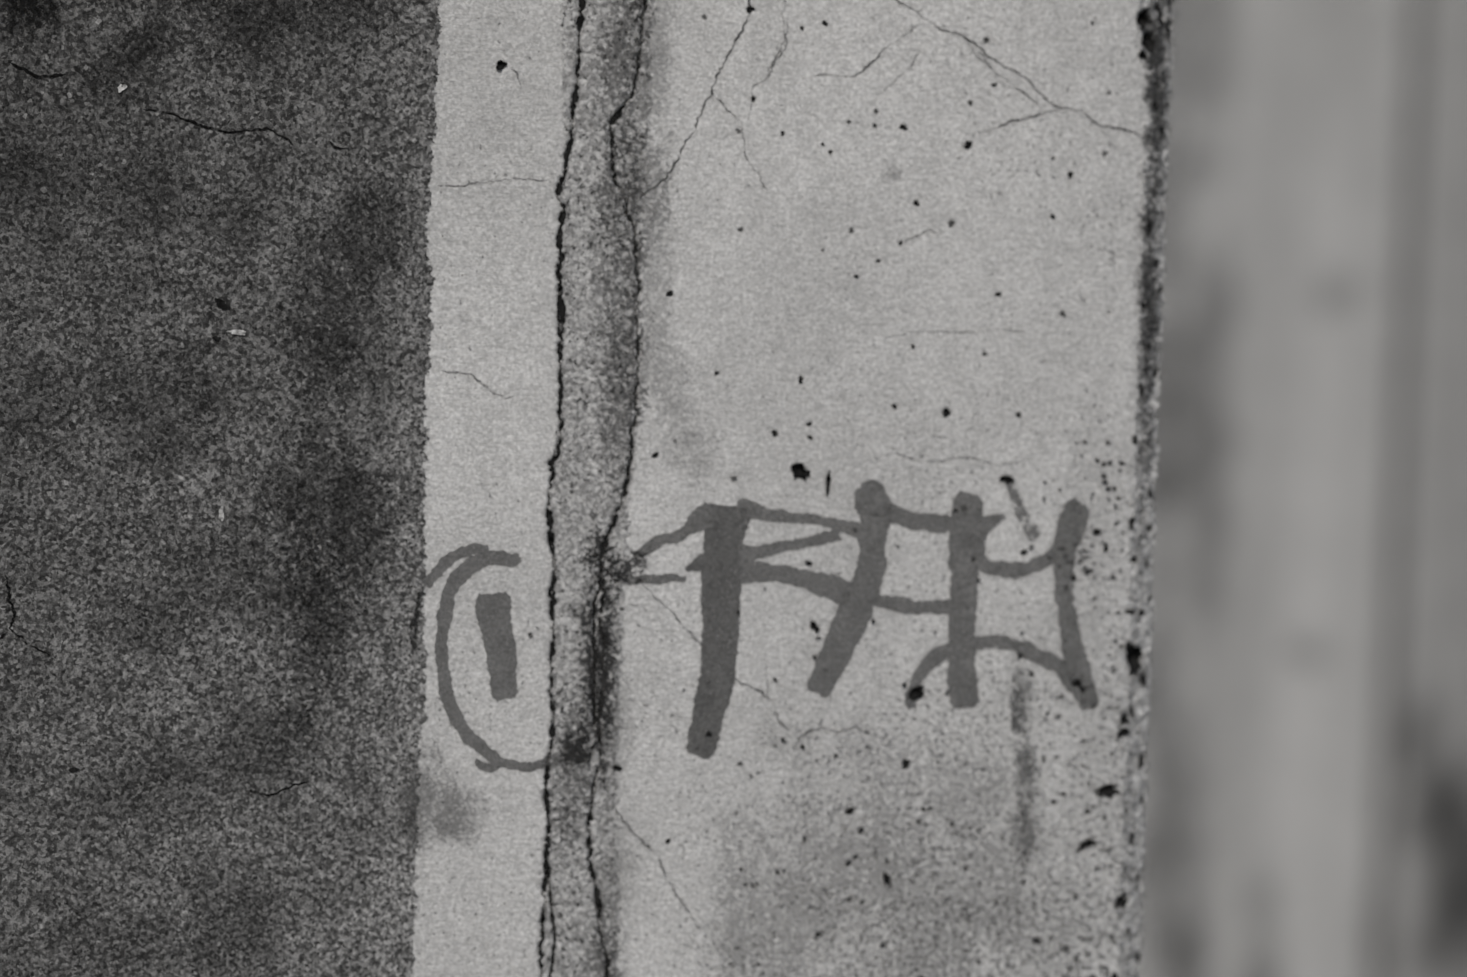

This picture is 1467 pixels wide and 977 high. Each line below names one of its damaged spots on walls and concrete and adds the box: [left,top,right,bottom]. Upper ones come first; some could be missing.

water stain [0,0,66,40]
crack [817,0,1141,150]
crack [440,0,789,977]
crack [896,453,1028,466]
crack [735,660,865,747]